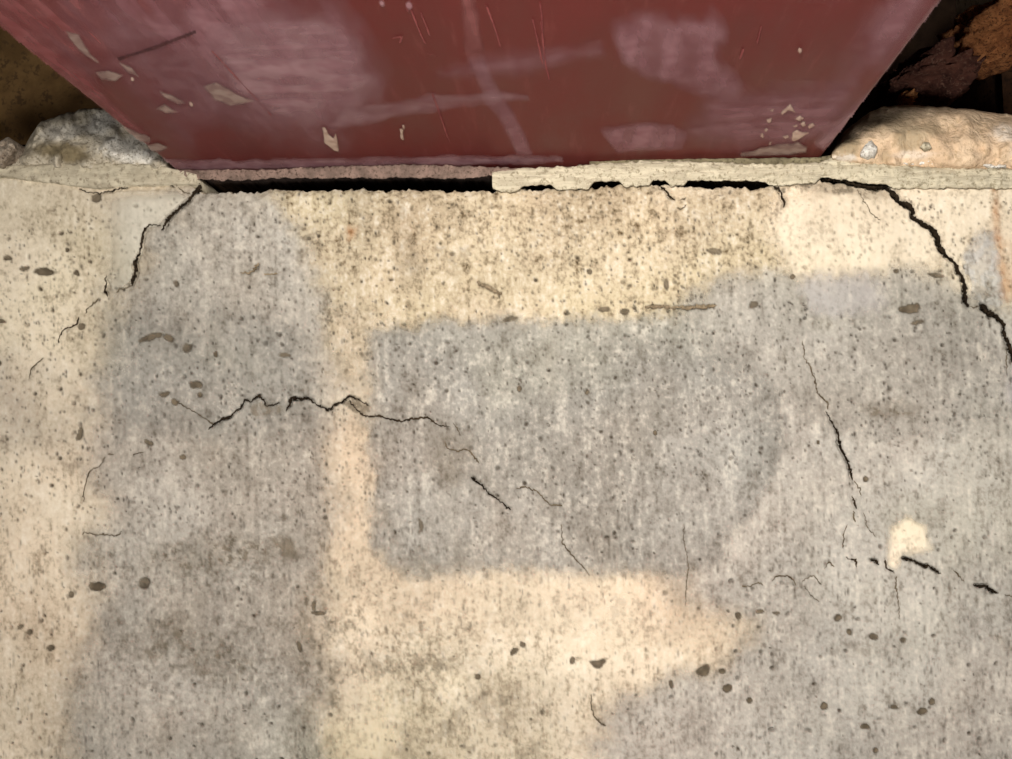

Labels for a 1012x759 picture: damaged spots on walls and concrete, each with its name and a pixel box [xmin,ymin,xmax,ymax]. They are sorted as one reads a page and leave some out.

crack [29,183,202,378]
crack [822,178,1012,373]
crack [177,394,590,576]
crack [742,341,1012,617]